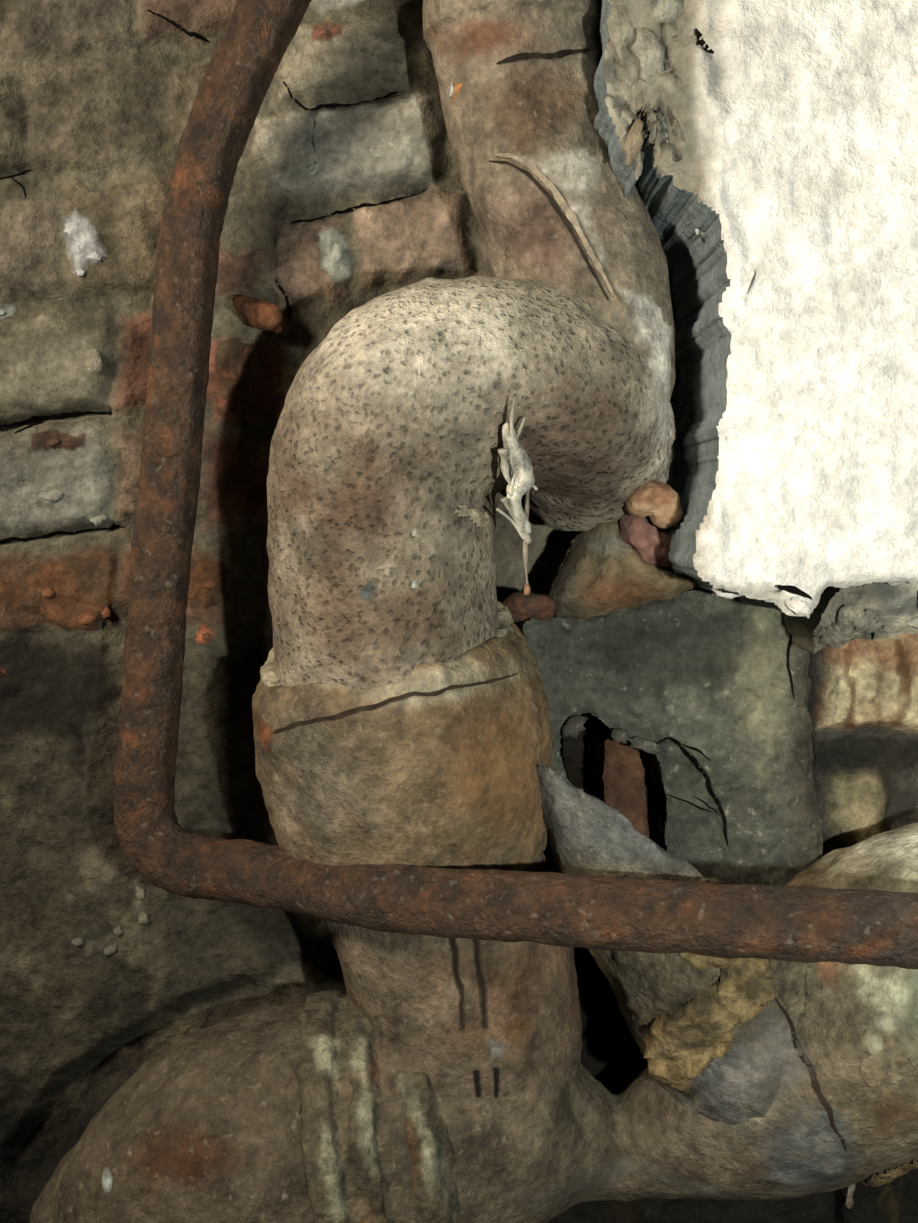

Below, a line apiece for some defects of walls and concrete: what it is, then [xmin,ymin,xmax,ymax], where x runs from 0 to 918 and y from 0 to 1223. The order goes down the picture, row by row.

peeling [562,714,588,739]
peeling [611,728,662,755]
crack [656,737,728,846]